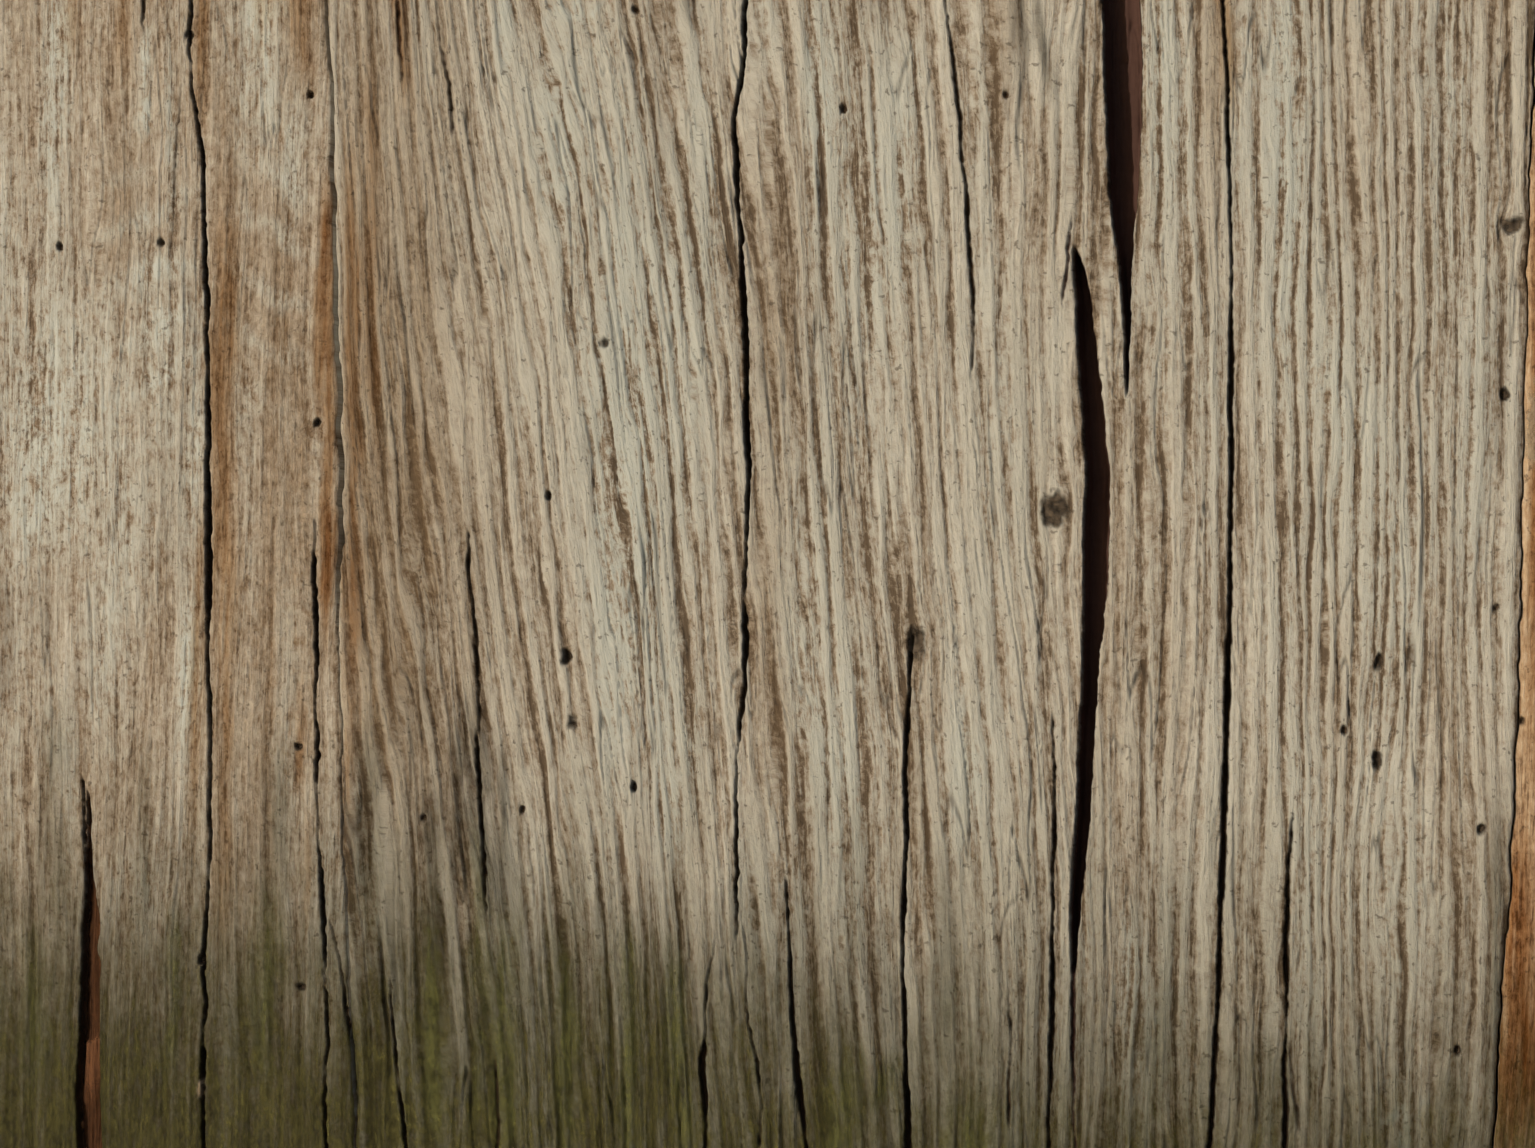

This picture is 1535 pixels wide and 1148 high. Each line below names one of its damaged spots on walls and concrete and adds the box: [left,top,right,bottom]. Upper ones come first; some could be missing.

crack [171,0,213,1148]
crack [733,0,752,736]
crack [1047,0,1143,1148]
crack [699,1039,708,1147]
crack [733,794,741,912]
crack [902,652,913,1148]
crack [1006,1012,1014,1124]